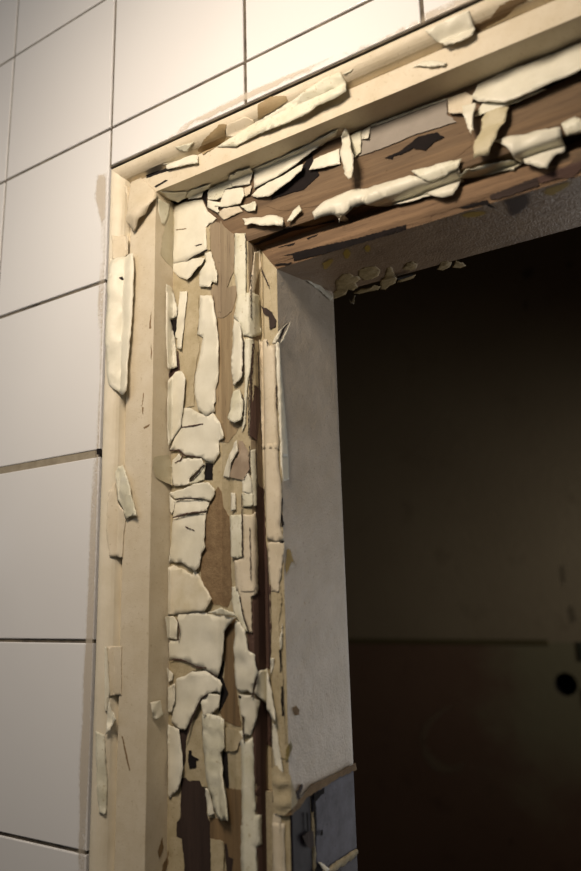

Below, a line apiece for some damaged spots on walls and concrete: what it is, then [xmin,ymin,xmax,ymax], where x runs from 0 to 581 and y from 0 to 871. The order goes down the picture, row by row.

peeling [425,0,527,46]
peeling [105,43,581,871]
peeling [95,646,122,815]